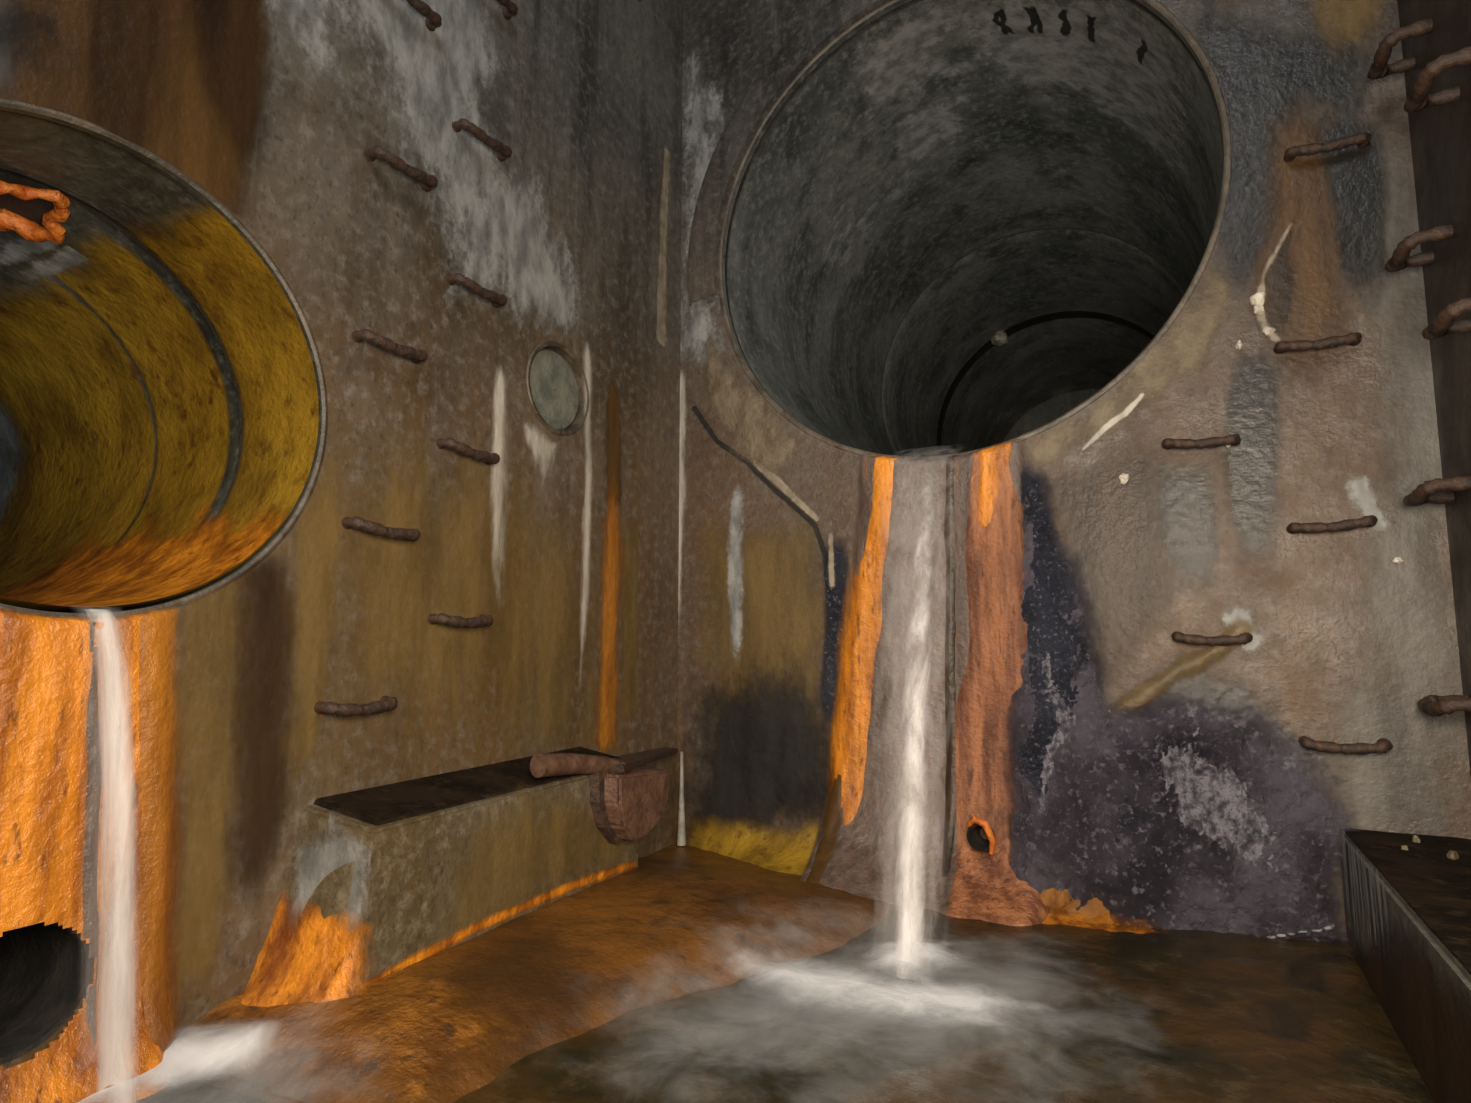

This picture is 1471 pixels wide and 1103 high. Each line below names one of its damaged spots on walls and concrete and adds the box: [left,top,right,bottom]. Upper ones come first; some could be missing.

efflorescence [265,0,578,334]
water stain [1030,0,1448,829]
corrosion [201,861,636,1096]
water stain [690,455,898,884]
water stain [942,441,1050,926]
water stain [1340,831,1389,948]